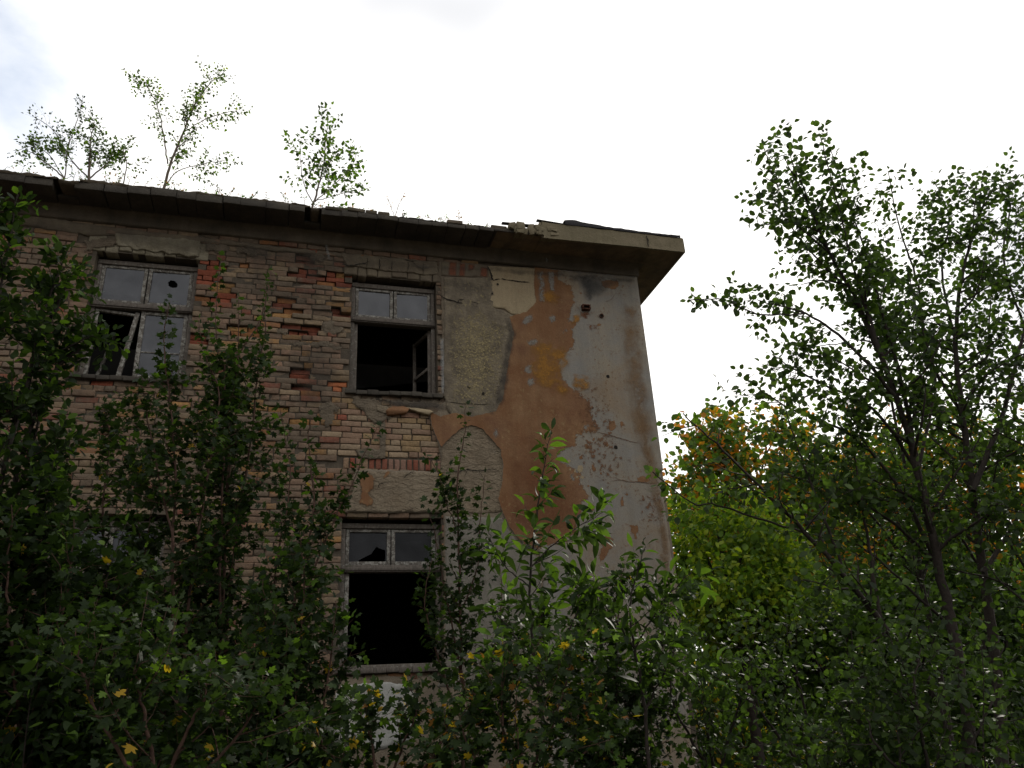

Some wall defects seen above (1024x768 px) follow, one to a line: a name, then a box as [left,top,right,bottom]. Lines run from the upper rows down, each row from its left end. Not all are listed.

spalling [0,173,514,248]
peeling [322,261,624,689]